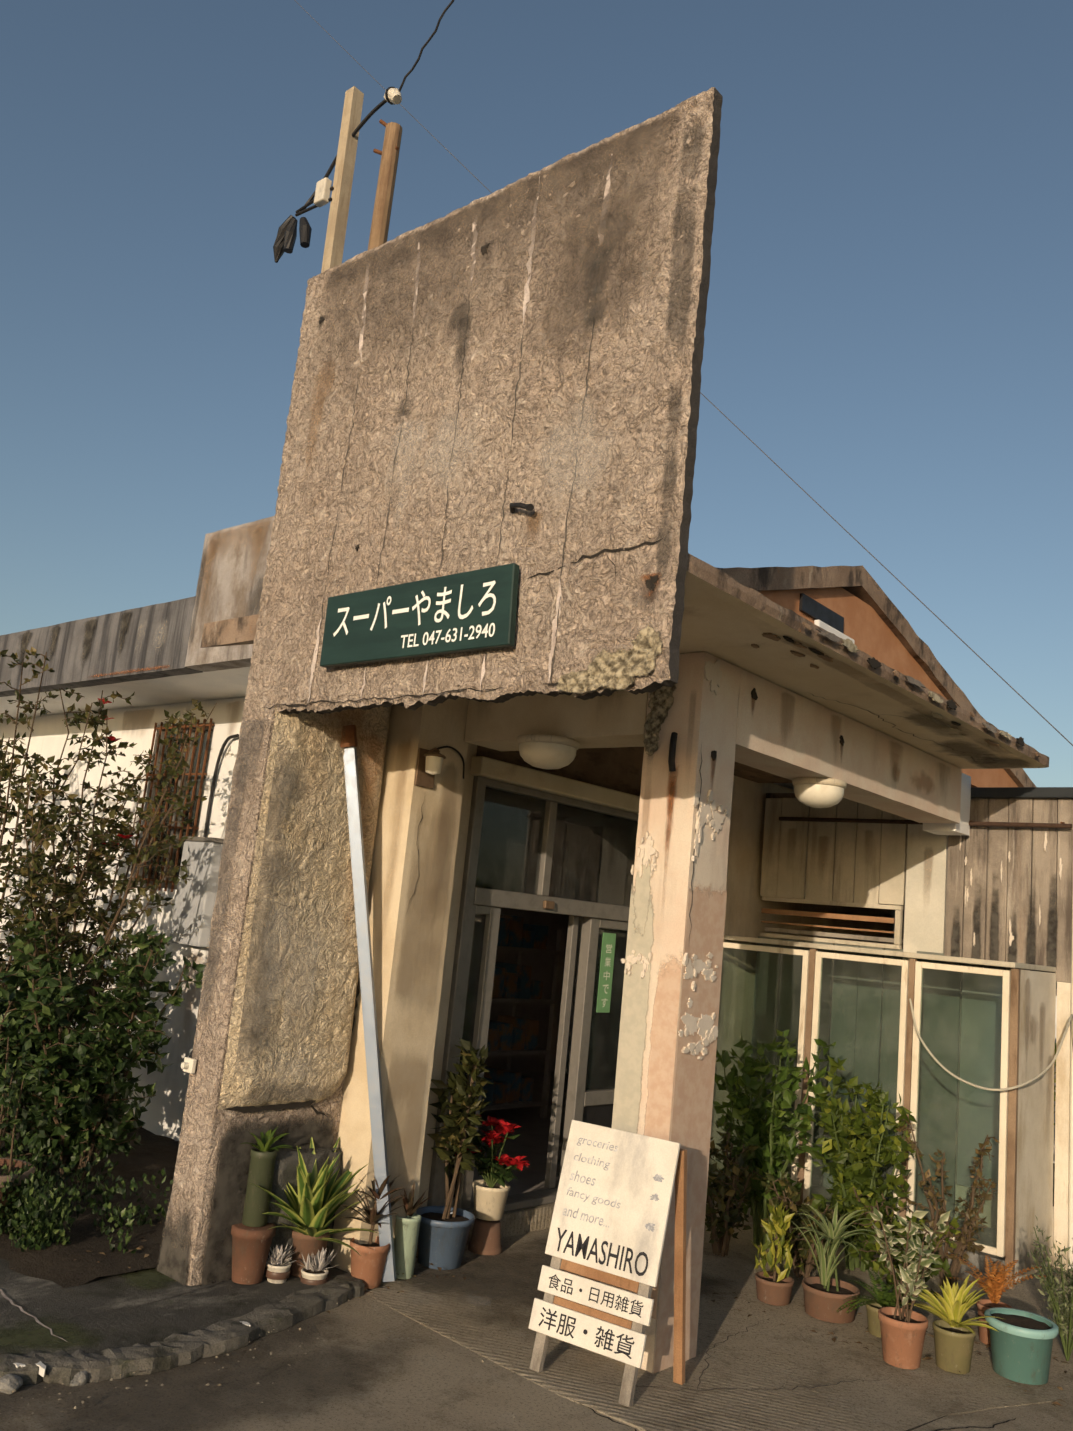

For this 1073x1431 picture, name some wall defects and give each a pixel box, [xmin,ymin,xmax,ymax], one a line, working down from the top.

crack [496,176,540,563]
crack [529,155,665,685]
spalling [556,625,662,693]
spalling [643,684,676,756]
peeling [631,831,659,878]
corrosion [667,771,676,841]
peeling [691,790,728,861]
peeling [621,950,653,978]
peeling [678,952,718,1060]